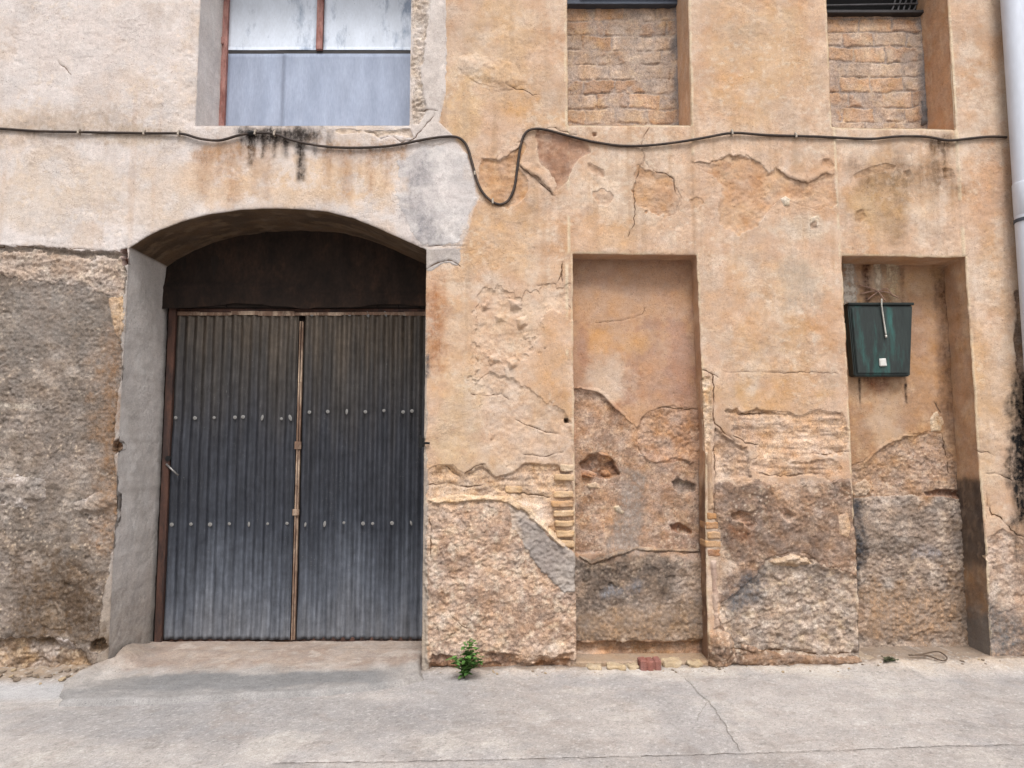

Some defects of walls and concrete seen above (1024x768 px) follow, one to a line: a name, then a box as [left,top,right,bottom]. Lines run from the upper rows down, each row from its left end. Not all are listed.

water stain [238,126,318,179]
flaking render [478,130,613,209]
flaking render [631,163,704,219]
peeling [691,151,837,236]
peeling [0,245,128,668]
peeling [428,283,957,556]
water stain [1006,379,1024,521]
peeling [719,555,864,673]
crack [639,678,970,756]